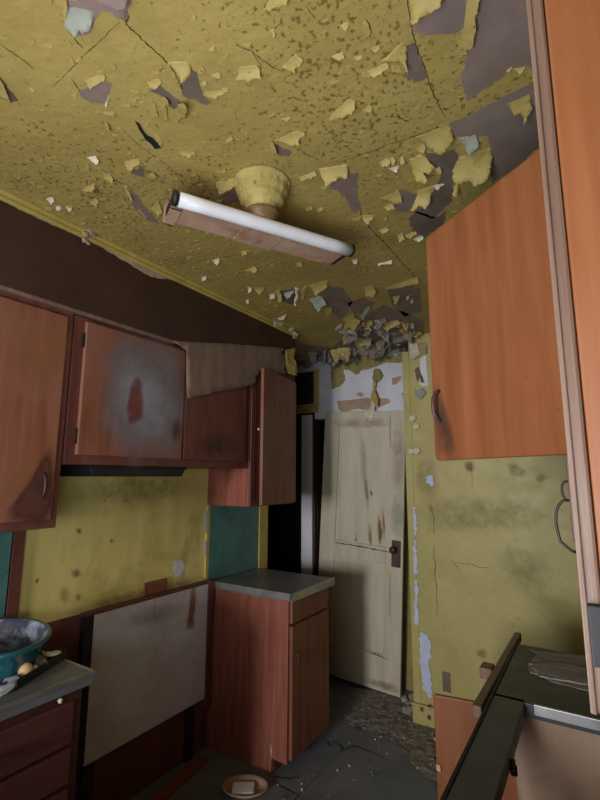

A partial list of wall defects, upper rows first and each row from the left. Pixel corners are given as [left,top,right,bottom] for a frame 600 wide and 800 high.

peeling [61,0,131,38]
peeling [135,61,229,149]
peeling [329,99,373,122]
crack [301,0,464,164]
peeling [367,0,532,101]
peeling [298,164,374,225]
peeling [378,84,539,242]
flaking render [245,277,428,399]
peeling [337,392,390,412]
peeling [413,507,432,698]
crack [432,512,486,616]
crack [270,739,389,800]